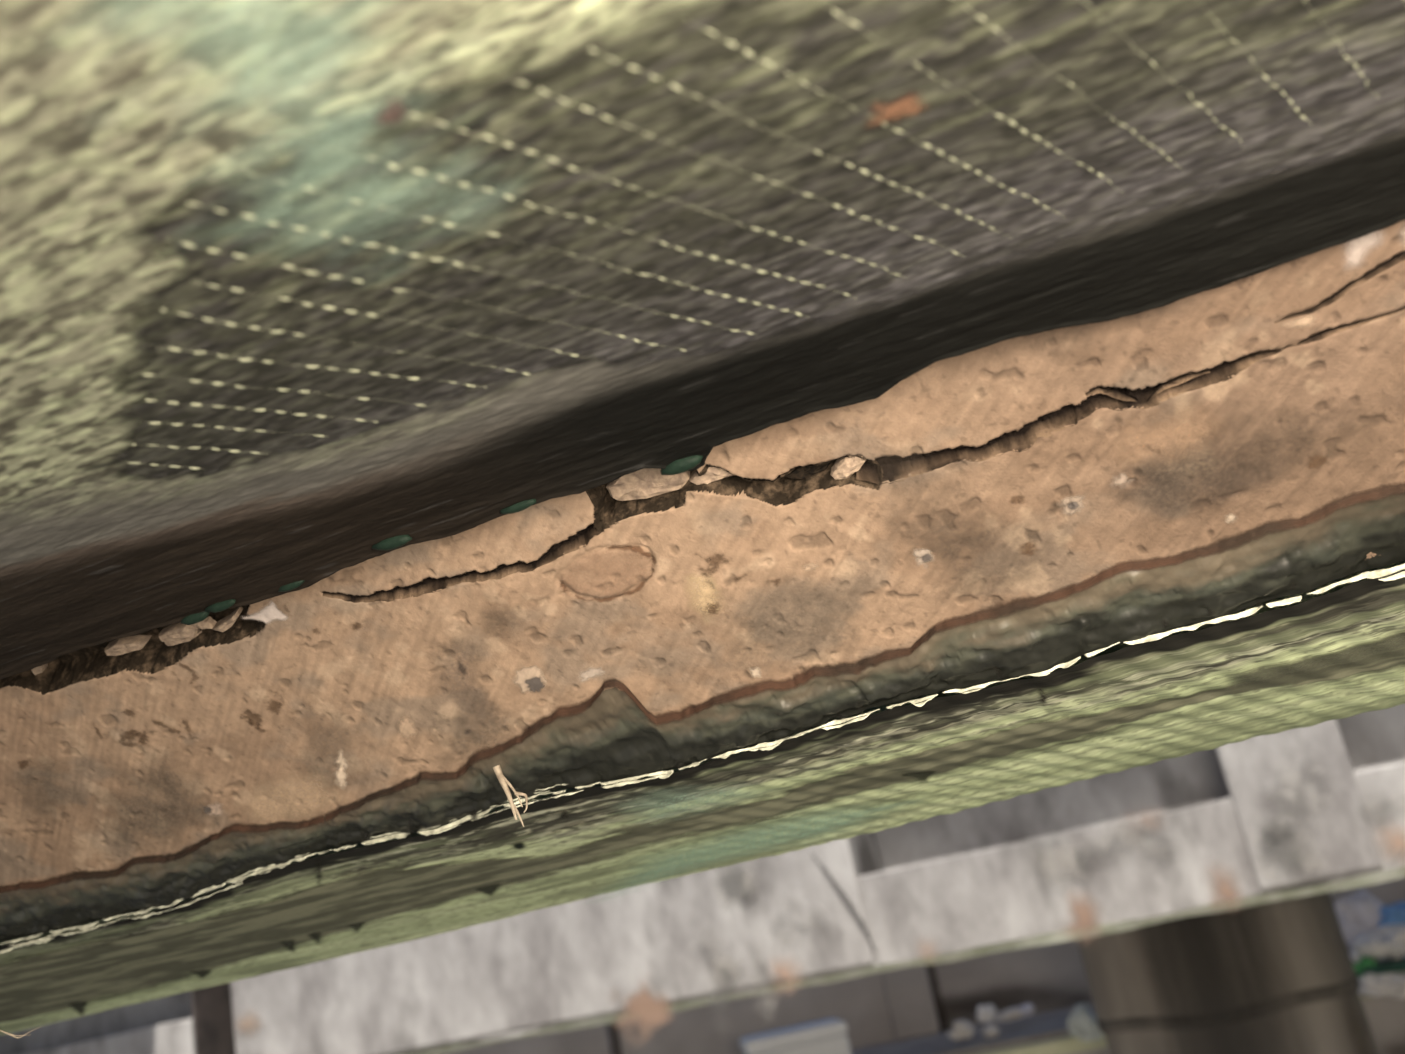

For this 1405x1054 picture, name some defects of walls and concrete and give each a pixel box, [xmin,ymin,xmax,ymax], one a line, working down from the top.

corrosion [875,95,919,123]
crack [856,251,1405,485]
crack [323,520,603,603]